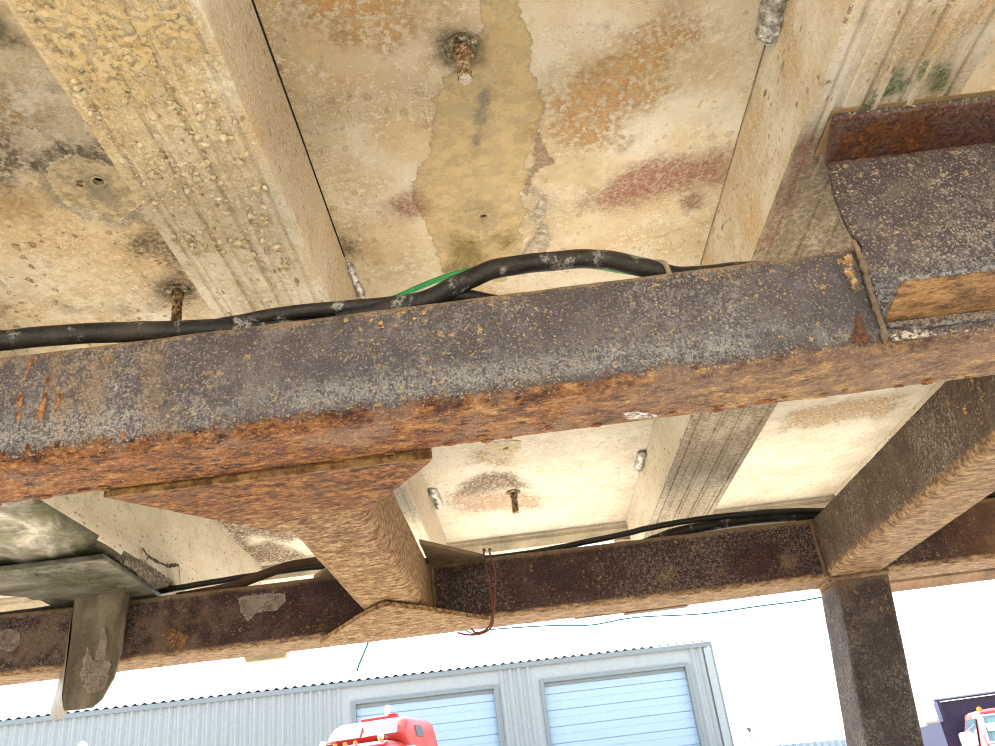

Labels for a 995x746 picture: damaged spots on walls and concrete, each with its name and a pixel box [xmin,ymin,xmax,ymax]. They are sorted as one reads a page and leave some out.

rust [548,16,699,146]
damp [410,0,554,274]
damp [0,134,178,268]
rust [843,254,858,289]
rust [37,377,62,422]
rust [786,396,899,429]
damp [452,473,538,512]
peeling [238,593,286,621]
peeling [0,629,20,652]
peeling [80,627,111,693]